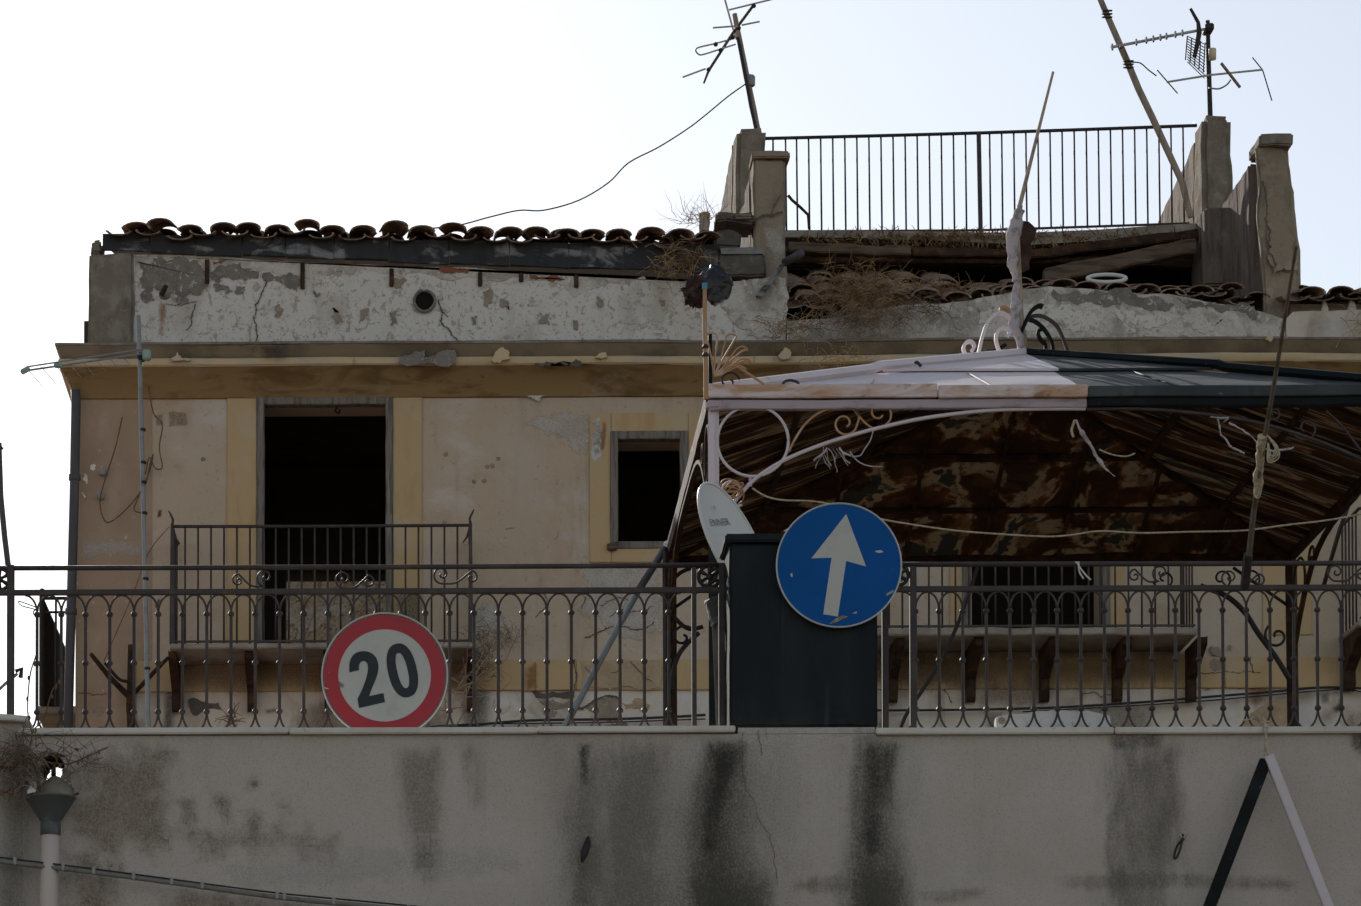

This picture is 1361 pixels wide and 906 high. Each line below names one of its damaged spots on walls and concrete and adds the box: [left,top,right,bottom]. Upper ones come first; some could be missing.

peeling [137,256,320,306]
peeling [439,266,469,274]
peeling [471,289,510,325]
peeling [707,276,791,360]
peeling [1023,287,1259,334]
peeling [399,349,457,368]
peeling [533,660,662,726]